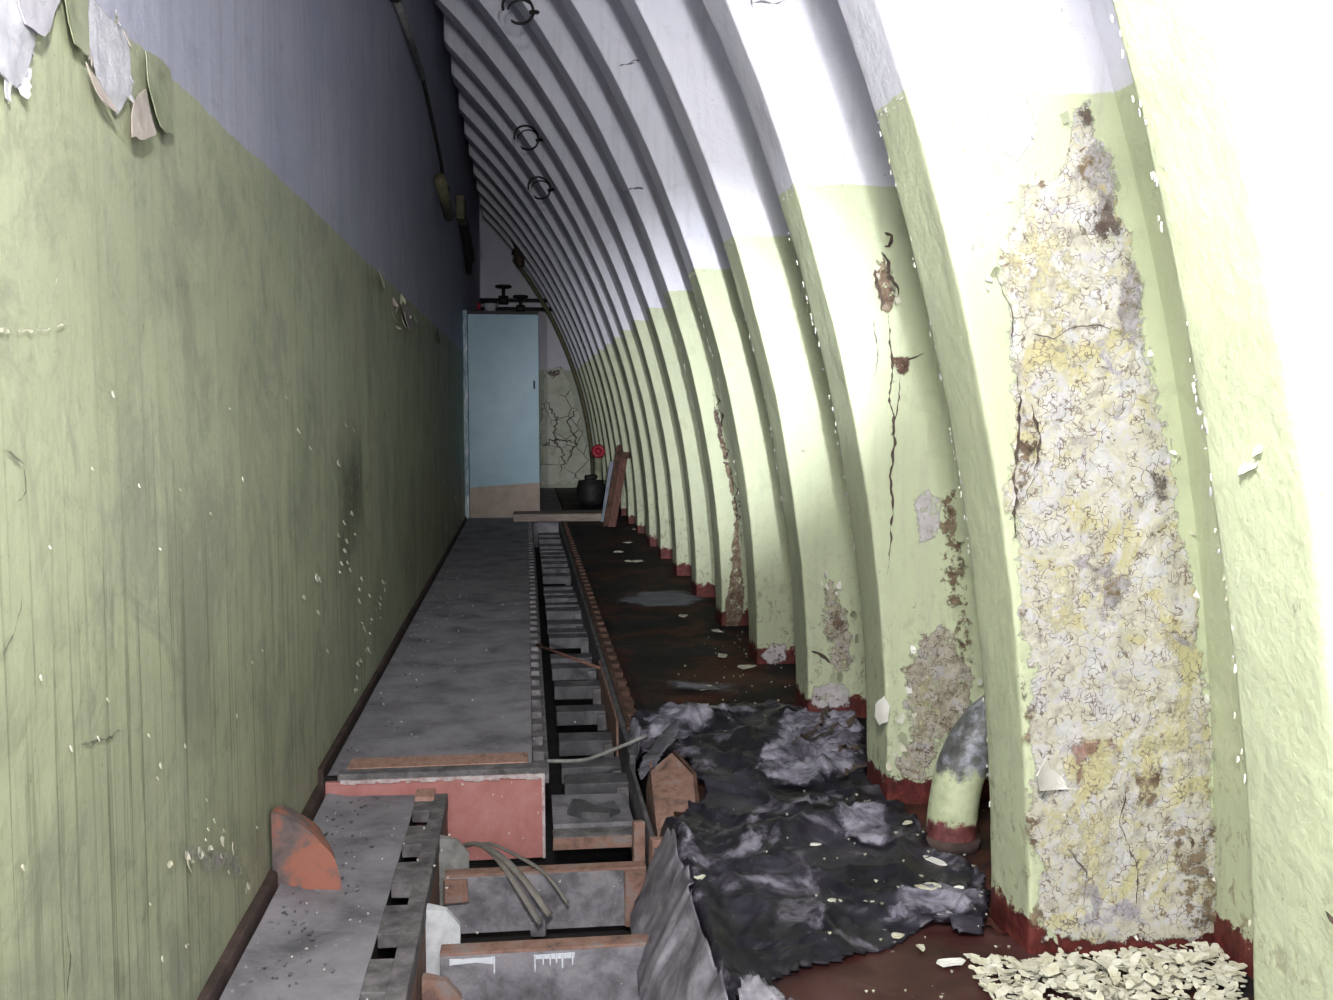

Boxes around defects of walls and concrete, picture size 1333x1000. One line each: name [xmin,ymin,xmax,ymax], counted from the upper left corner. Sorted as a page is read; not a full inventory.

peeling [0,0,174,140]
spalling [812,570,860,708]
crack [873,315,922,573]
spalling [874,427,984,781]
spalling [972,102,1217,945]
spalling [1238,444,1262,475]